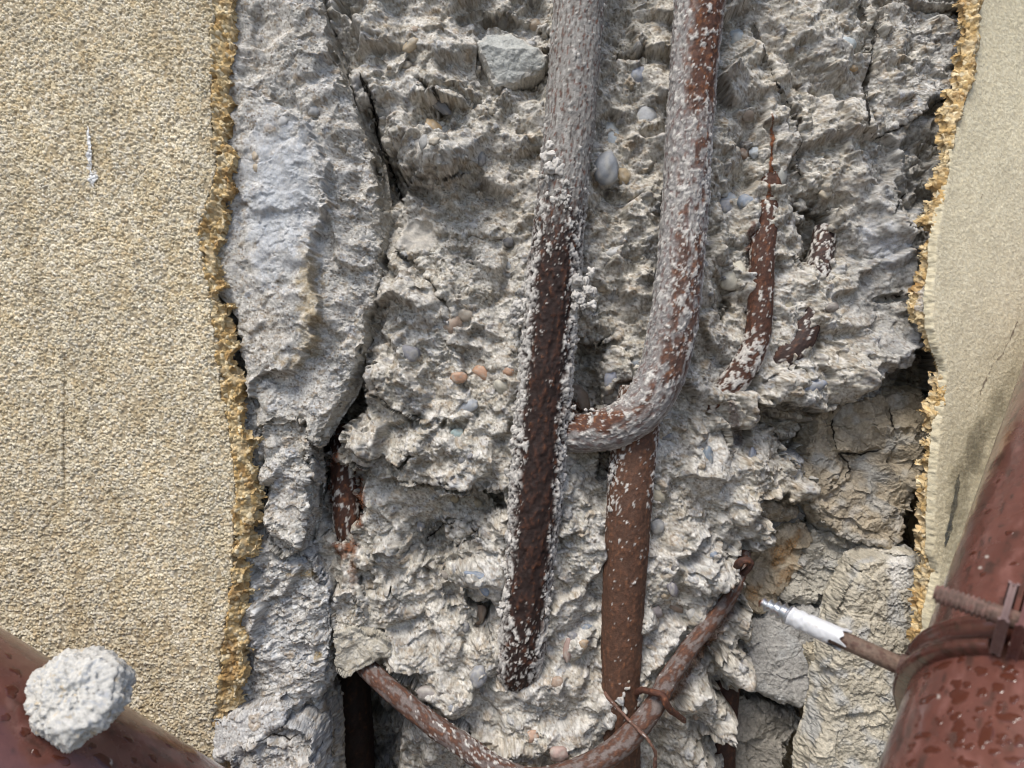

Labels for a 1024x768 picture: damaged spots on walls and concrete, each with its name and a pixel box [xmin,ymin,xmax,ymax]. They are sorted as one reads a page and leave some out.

crack [864,39,904,140]
crack [346,72,404,203]
rust [766,114,775,199]
spalling [197,0,268,729]
spalling [313,0,984,768]
crack [829,409,899,490]
rust [356,469,366,526]
rust [333,538,356,581]
rust [669,609,733,701]